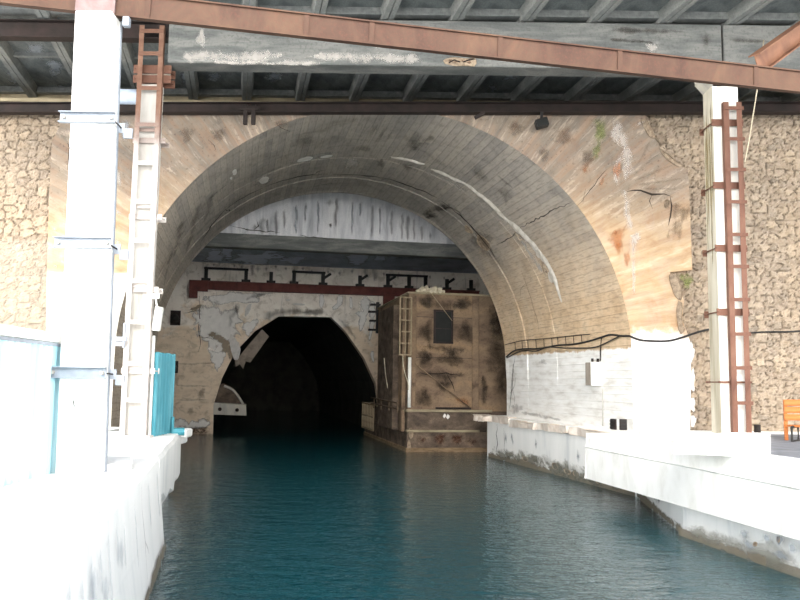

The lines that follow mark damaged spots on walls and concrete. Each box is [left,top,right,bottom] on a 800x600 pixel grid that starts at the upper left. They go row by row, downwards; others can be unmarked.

crack [202,170,606,257]
damp [391,156,562,302]
crack [627,190,672,225]
peeling [193,292,260,369]
damp [492,344,506,389]
spalling [669,274,691,334]
damp [488,451,800,578]